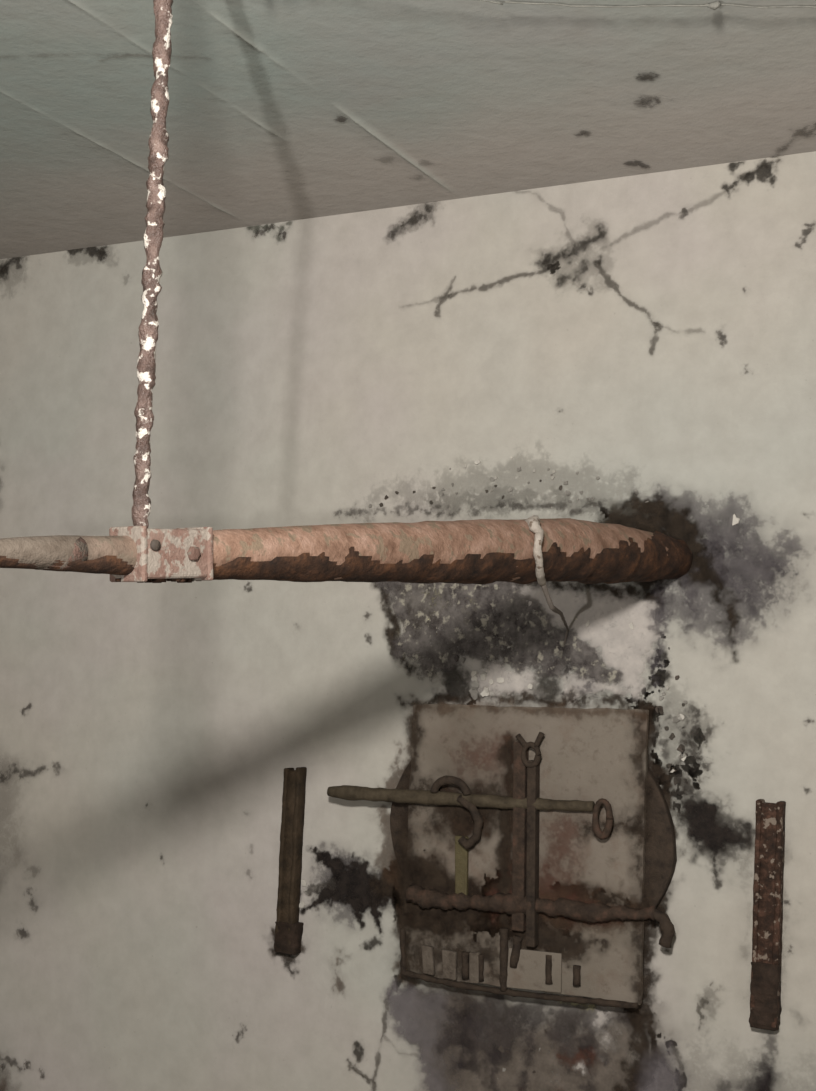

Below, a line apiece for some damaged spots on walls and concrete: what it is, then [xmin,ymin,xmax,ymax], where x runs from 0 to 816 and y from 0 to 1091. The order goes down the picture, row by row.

crack [722,128,809,192]
crack [435,228,660,354]
leakage [693,539,756,661]
spalling [374,581,711,795]
leakage [0,764,60,782]
leakage [677,775,752,888]
rust [270,928,304,974]
leakage [386,981,654,1091]